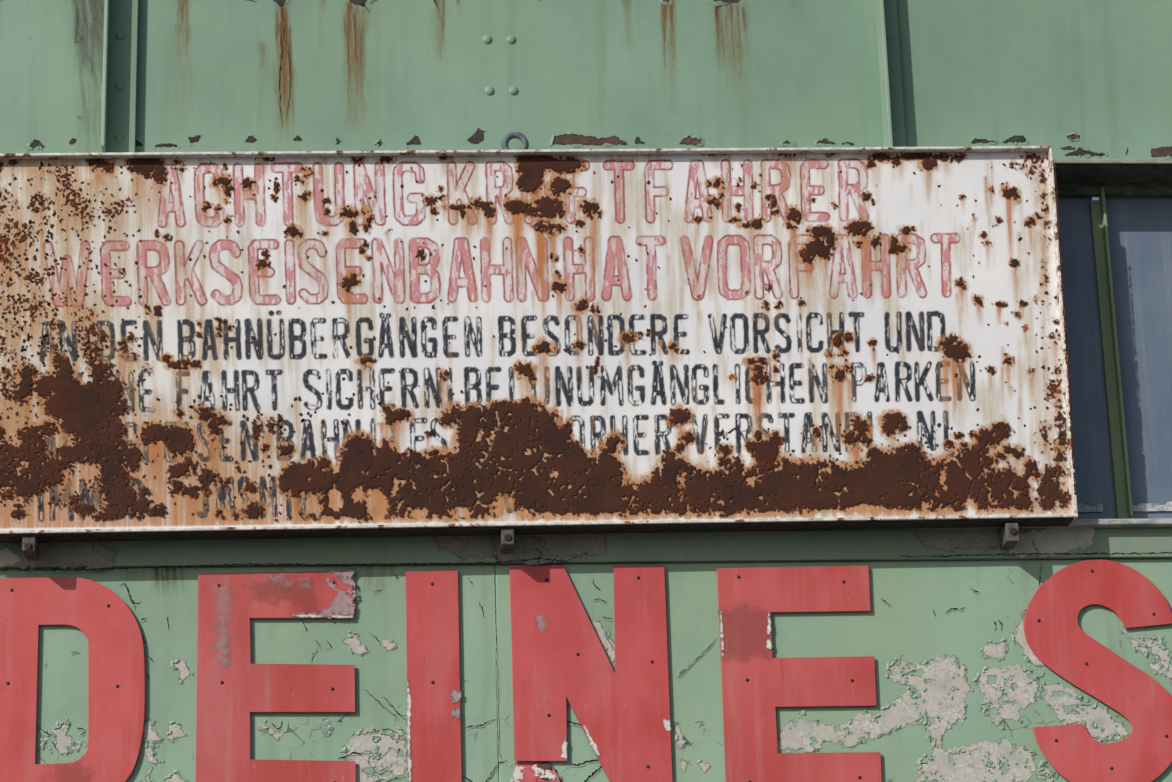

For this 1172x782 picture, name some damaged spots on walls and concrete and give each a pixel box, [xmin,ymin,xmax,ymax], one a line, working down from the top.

rust [276,5,291,110]
rust [344,1,362,79]
rust [0,152,1072,528]
peeling [0,542,118,572]
crack [0,549,568,782]
peeling [317,682,412,782]
peeling [510,737,568,782]
crack [588,582,614,650]
peeling [777,608,1128,782]
peeling [1118,629,1172,683]